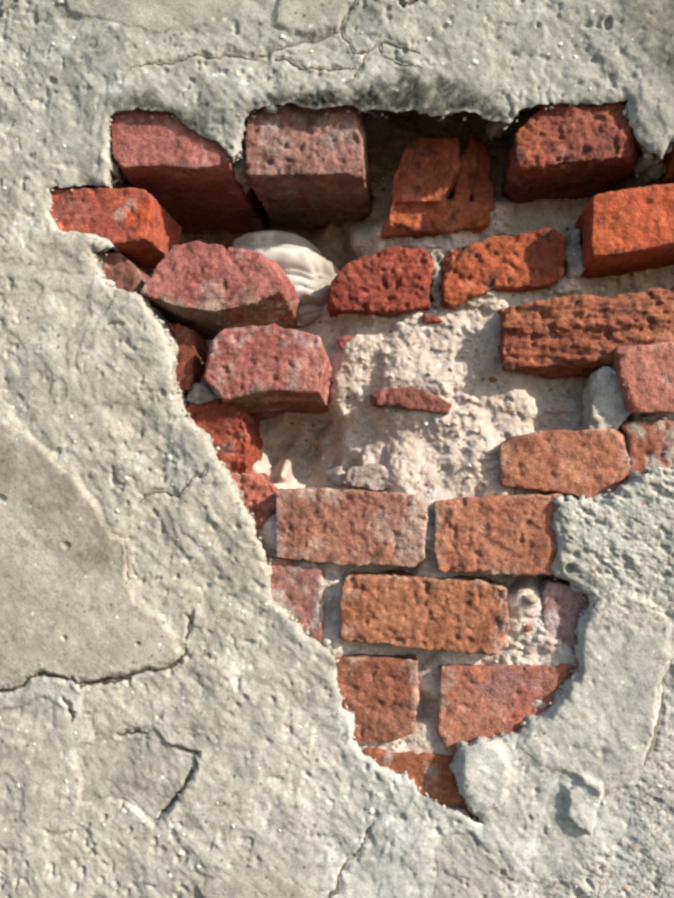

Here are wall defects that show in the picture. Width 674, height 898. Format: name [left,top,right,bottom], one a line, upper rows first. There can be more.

crack [0,0,18,17]
crack [128,0,426,83]
spalling [49,107,139,229]
spalling [92,238,309,636]
spalling [252,100,674,824]
flaking render [0,415,179,719]
crack [0,612,192,722]
crack [119,729,149,737]
spalling [78,728,195,823]
crack [156,744,198,820]
crack [329,811,380,898]
peeling [565,781,602,833]